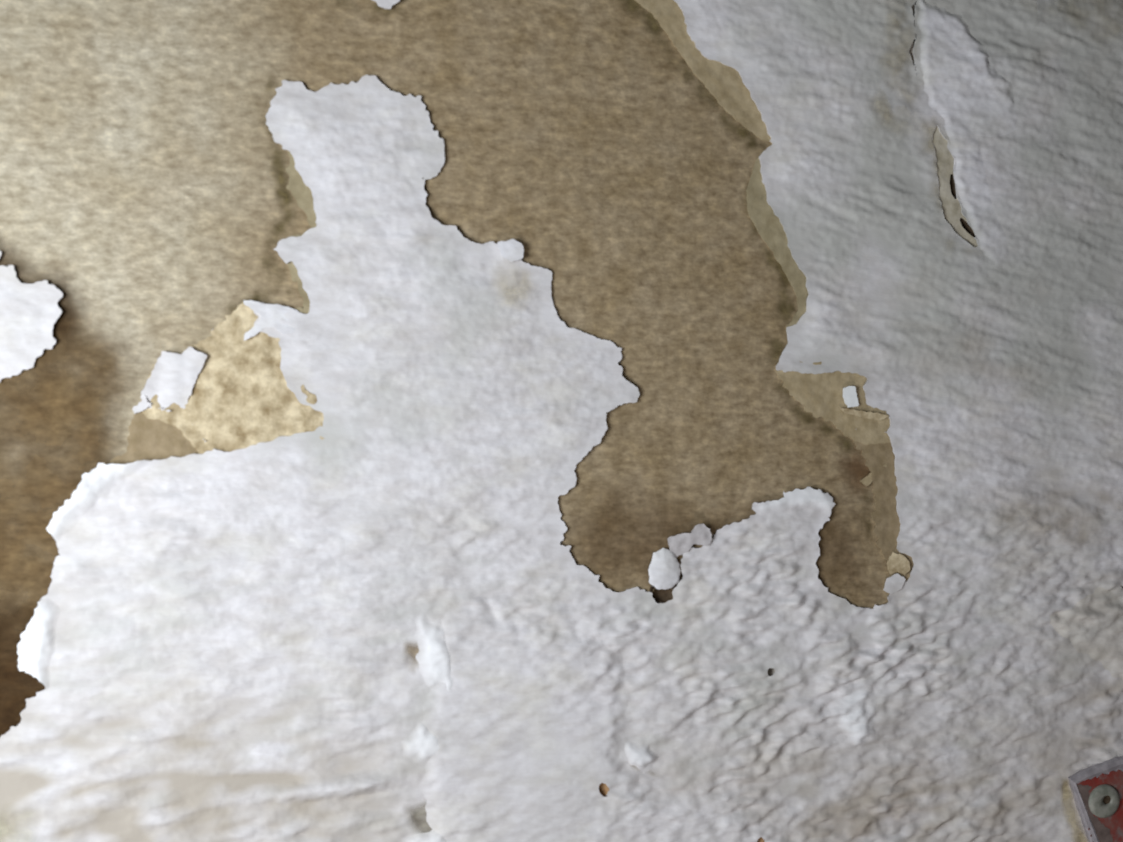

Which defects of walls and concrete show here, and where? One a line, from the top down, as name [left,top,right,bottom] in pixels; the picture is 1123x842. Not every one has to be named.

peeling [917,0,1018,270]
peeling [0,0,914,609]
peeling [17,595,61,695]